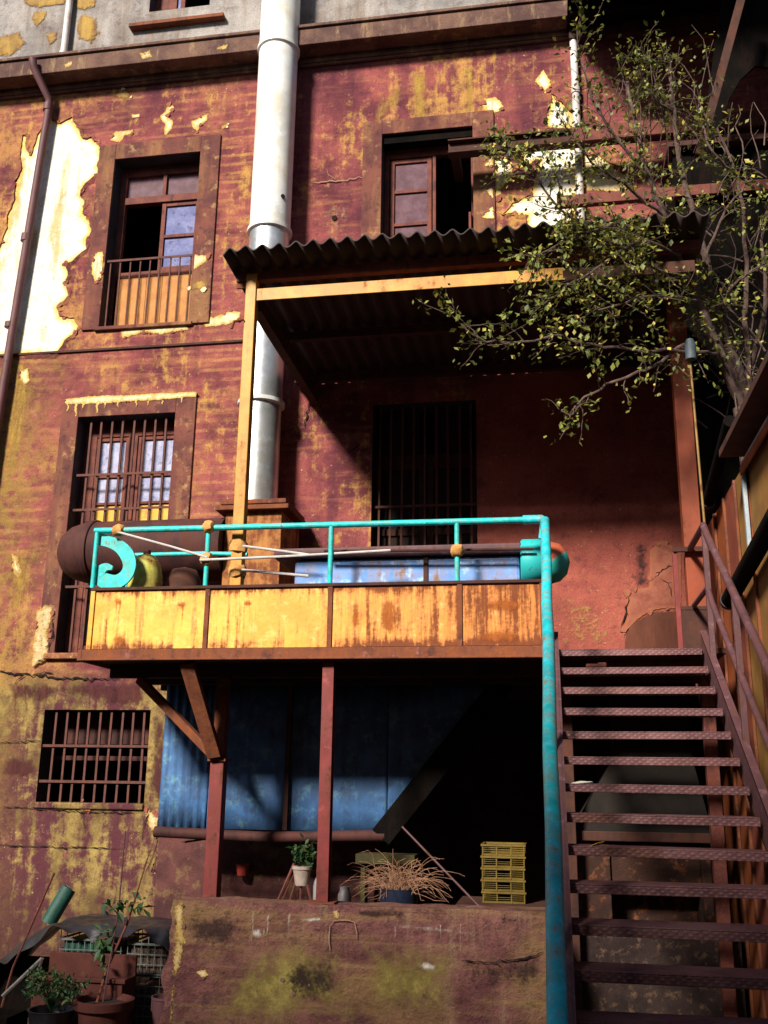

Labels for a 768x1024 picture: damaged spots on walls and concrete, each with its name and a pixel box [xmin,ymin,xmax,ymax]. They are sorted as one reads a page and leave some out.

flaking render [24,0,100,44]
flaking render [479,97,504,112]
flaking render [536,70,573,130]
flaking render [483,149,638,227]
flaking render [0,114,140,385]
spalling [31,605,54,666]
crack [0,620,114,686]
rust [382,601,395,630]
water stain [10,684,142,704]
water stain [4,758,33,775]
water stain [152,723,164,797]
crack [462,951,544,966]